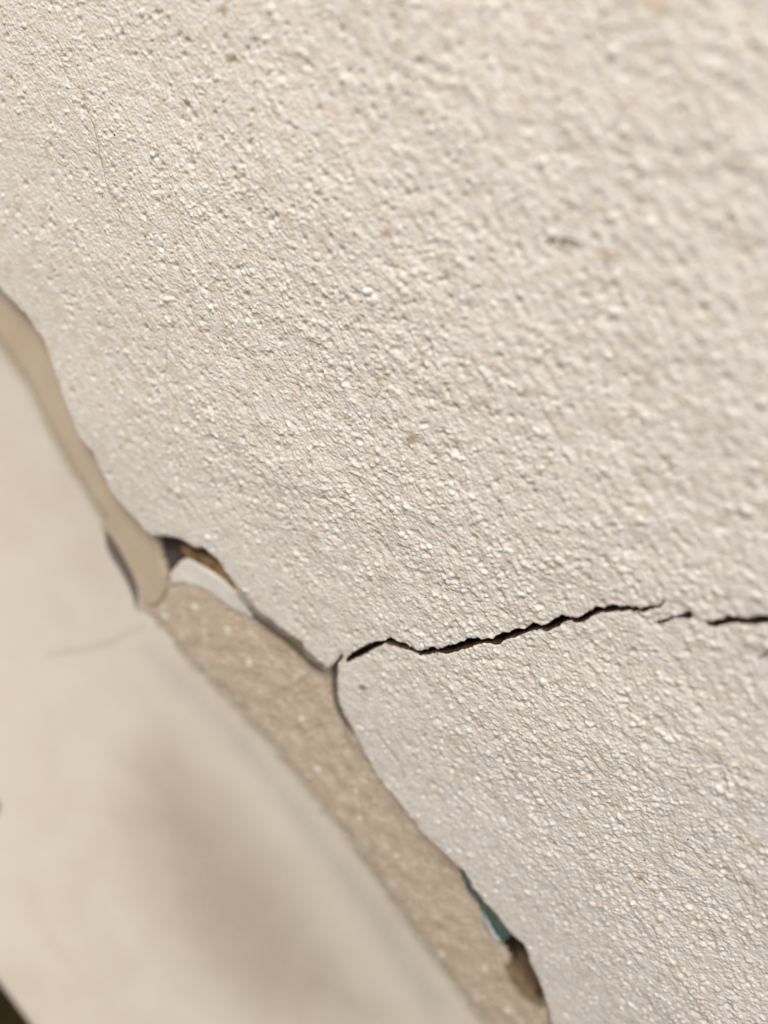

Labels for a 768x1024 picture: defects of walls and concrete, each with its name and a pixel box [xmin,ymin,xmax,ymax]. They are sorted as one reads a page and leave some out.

flaking render [161,536,253,619]
crack [237,595,768,731]
flaking render [460,868,544,1003]